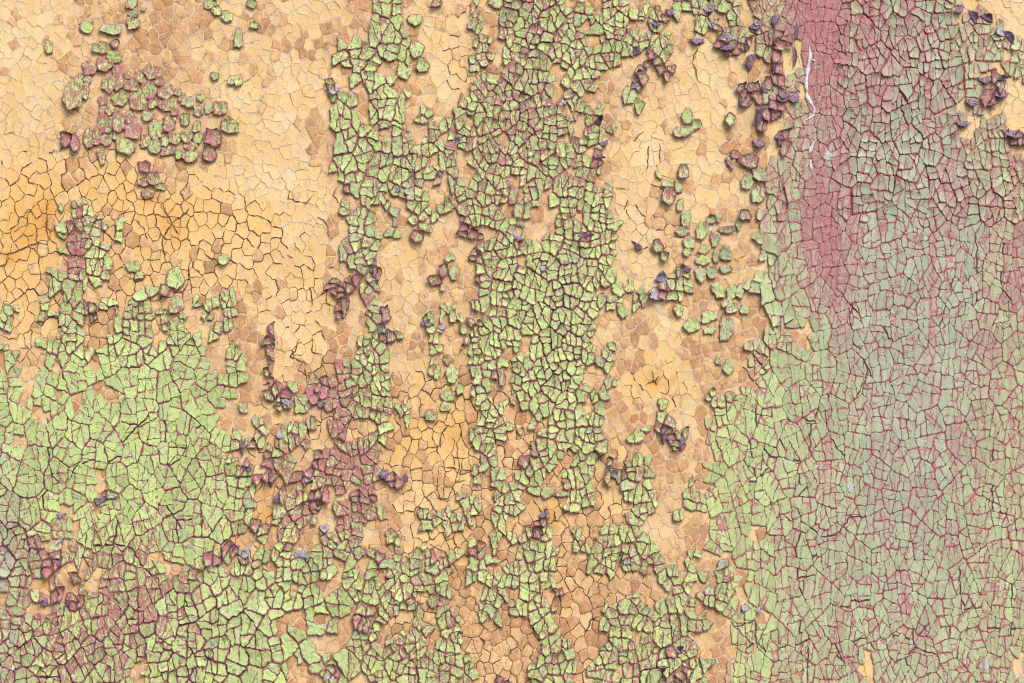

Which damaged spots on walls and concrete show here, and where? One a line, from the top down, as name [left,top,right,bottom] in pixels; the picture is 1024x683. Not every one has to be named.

peeling [217,0,287,89]
peeling [636,0,743,53]
peeling [42,0,239,203]
peeling [645,163,725,302]
peeling [0,301,24,339]
crack [0,0,813,683]
crack [837,290,868,402]
crack [939,242,1010,325]
peeling [654,398,692,451]
crack [727,432,865,597]
crack [778,620,875,683]
crack [889,624,929,673]